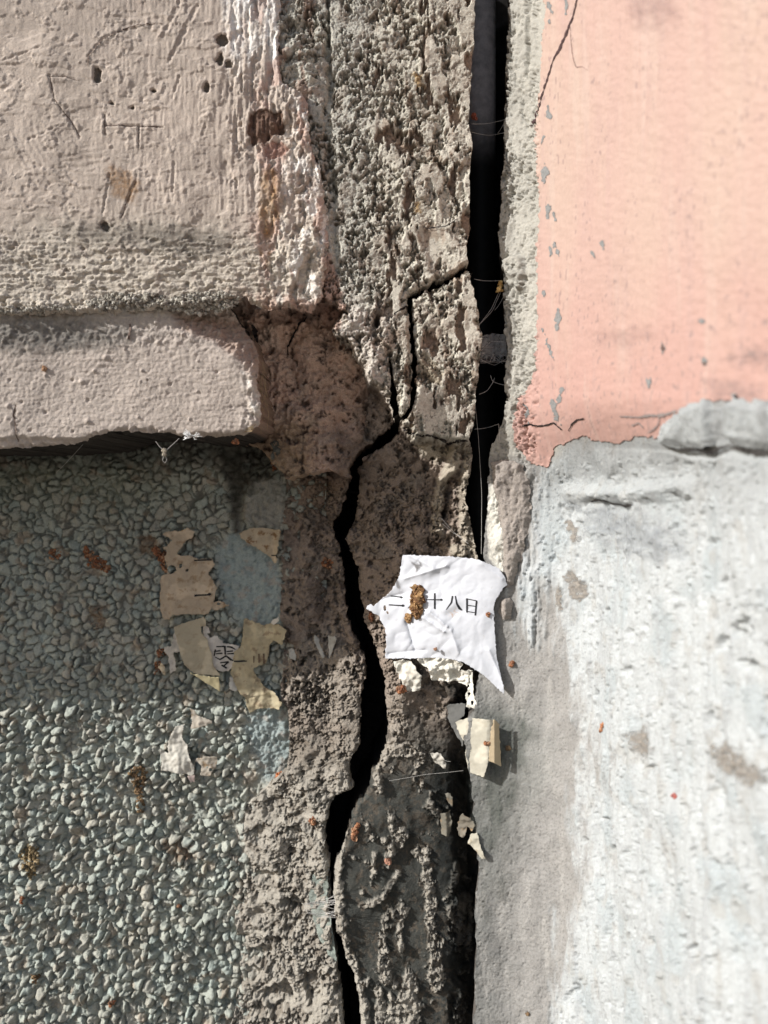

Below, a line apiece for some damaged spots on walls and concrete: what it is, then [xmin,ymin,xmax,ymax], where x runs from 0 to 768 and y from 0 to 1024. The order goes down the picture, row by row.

crack [529,0,587,127]
peeling [549,387,564,425]
crack [325,266,473,1024]